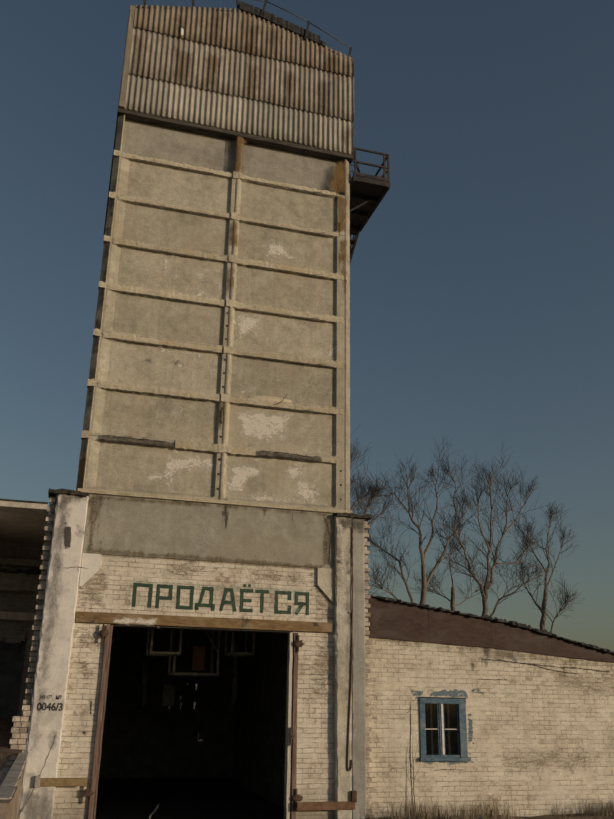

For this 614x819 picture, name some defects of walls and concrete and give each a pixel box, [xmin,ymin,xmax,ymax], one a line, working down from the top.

corrosion [330,163,347,293]
peeling [237,411,294,446]
peeling [148,450,214,492]
peeling [227,459,319,504]
crack [483,659,609,683]